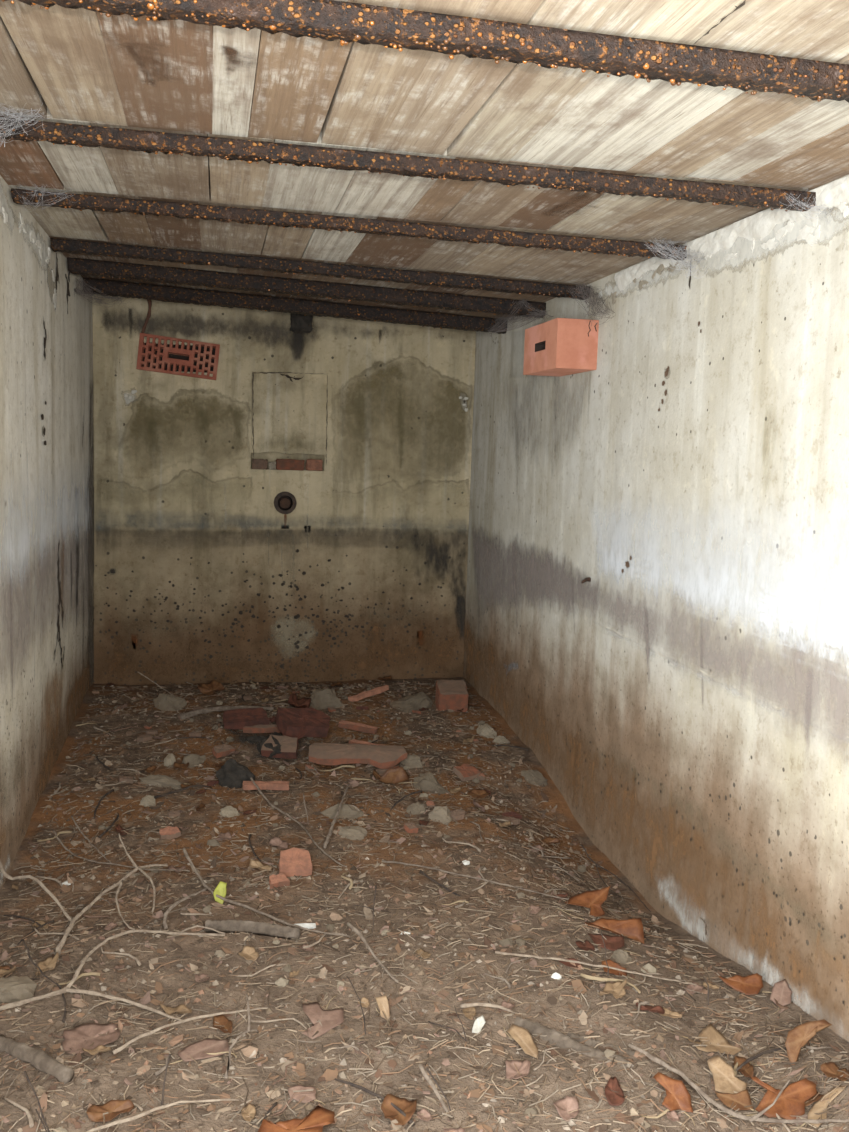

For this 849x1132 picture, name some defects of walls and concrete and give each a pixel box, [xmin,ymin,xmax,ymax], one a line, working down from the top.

crack [695,0,746,43]
water stain [133,398,243,433]
water stain [3,386,106,799]
crack [54,541,65,669]
water stain [384,529,596,636]
water stain [603,530,661,588]
water stain [611,560,849,739]